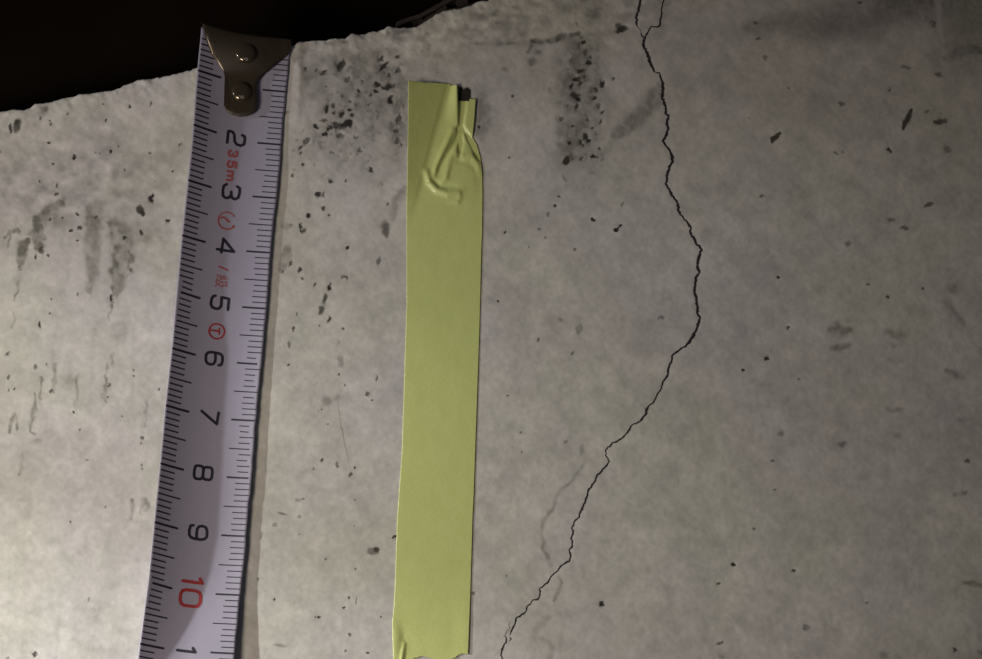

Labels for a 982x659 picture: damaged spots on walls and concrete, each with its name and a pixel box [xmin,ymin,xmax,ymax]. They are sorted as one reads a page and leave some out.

water stain [18,210,49,256]
crack [500,0,703,659]